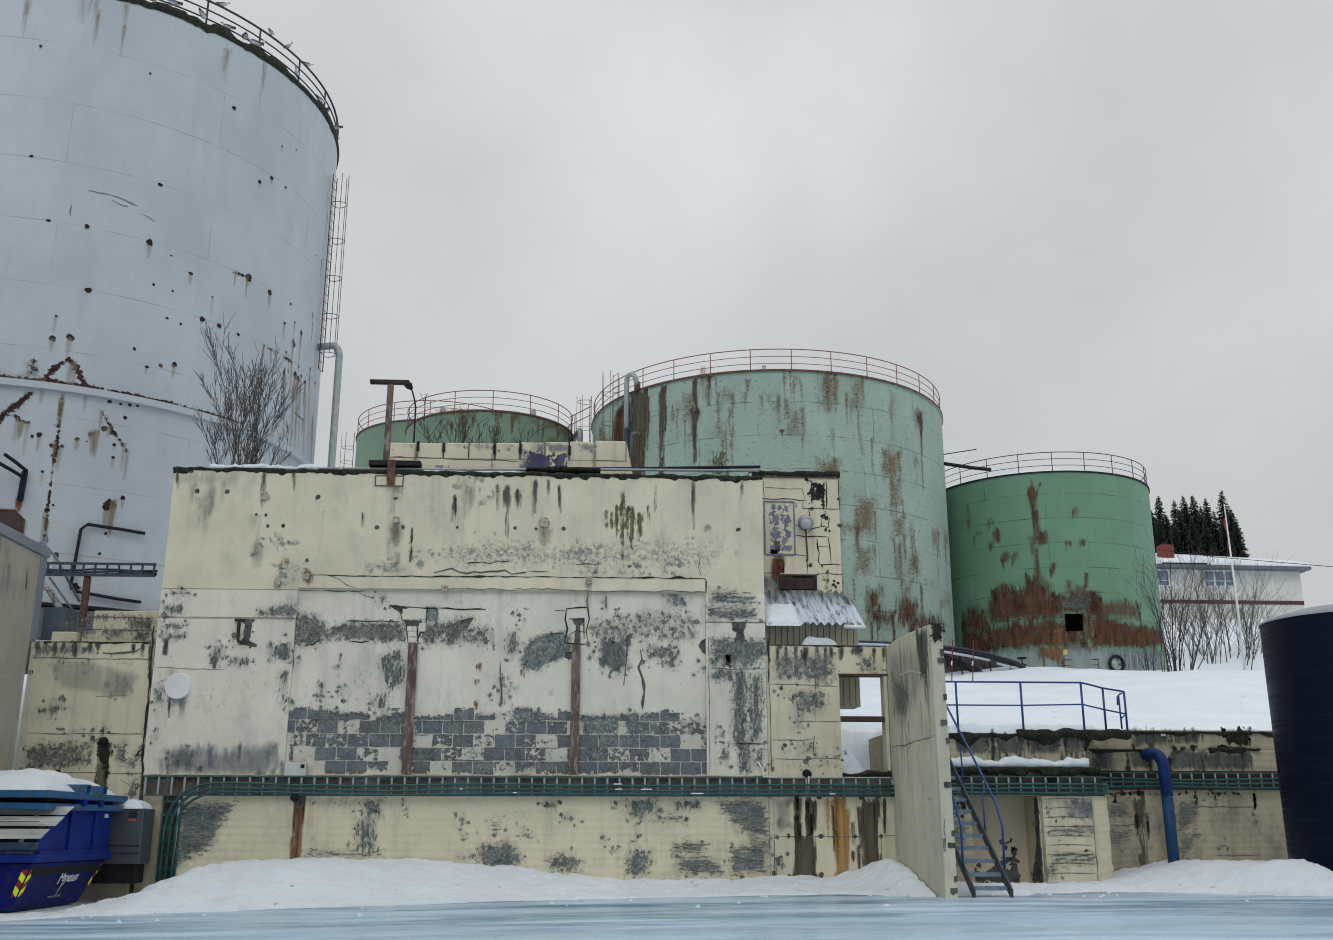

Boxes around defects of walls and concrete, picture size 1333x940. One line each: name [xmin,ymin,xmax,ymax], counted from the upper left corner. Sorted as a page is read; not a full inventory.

rust [0,357,241,541]
rust [599,368,749,475]
water stain [605,500,655,550]
rust [842,439,944,642]
rust [961,484,1162,668]
peeling [206,526,847,776]
peeling [301,798,408,857]
peeling [454,812,533,866]
peeling [600,797,790,879]
water stain [793,795,835,876]
water stain [851,797,886,869]
water stain [974,797,1044,883]